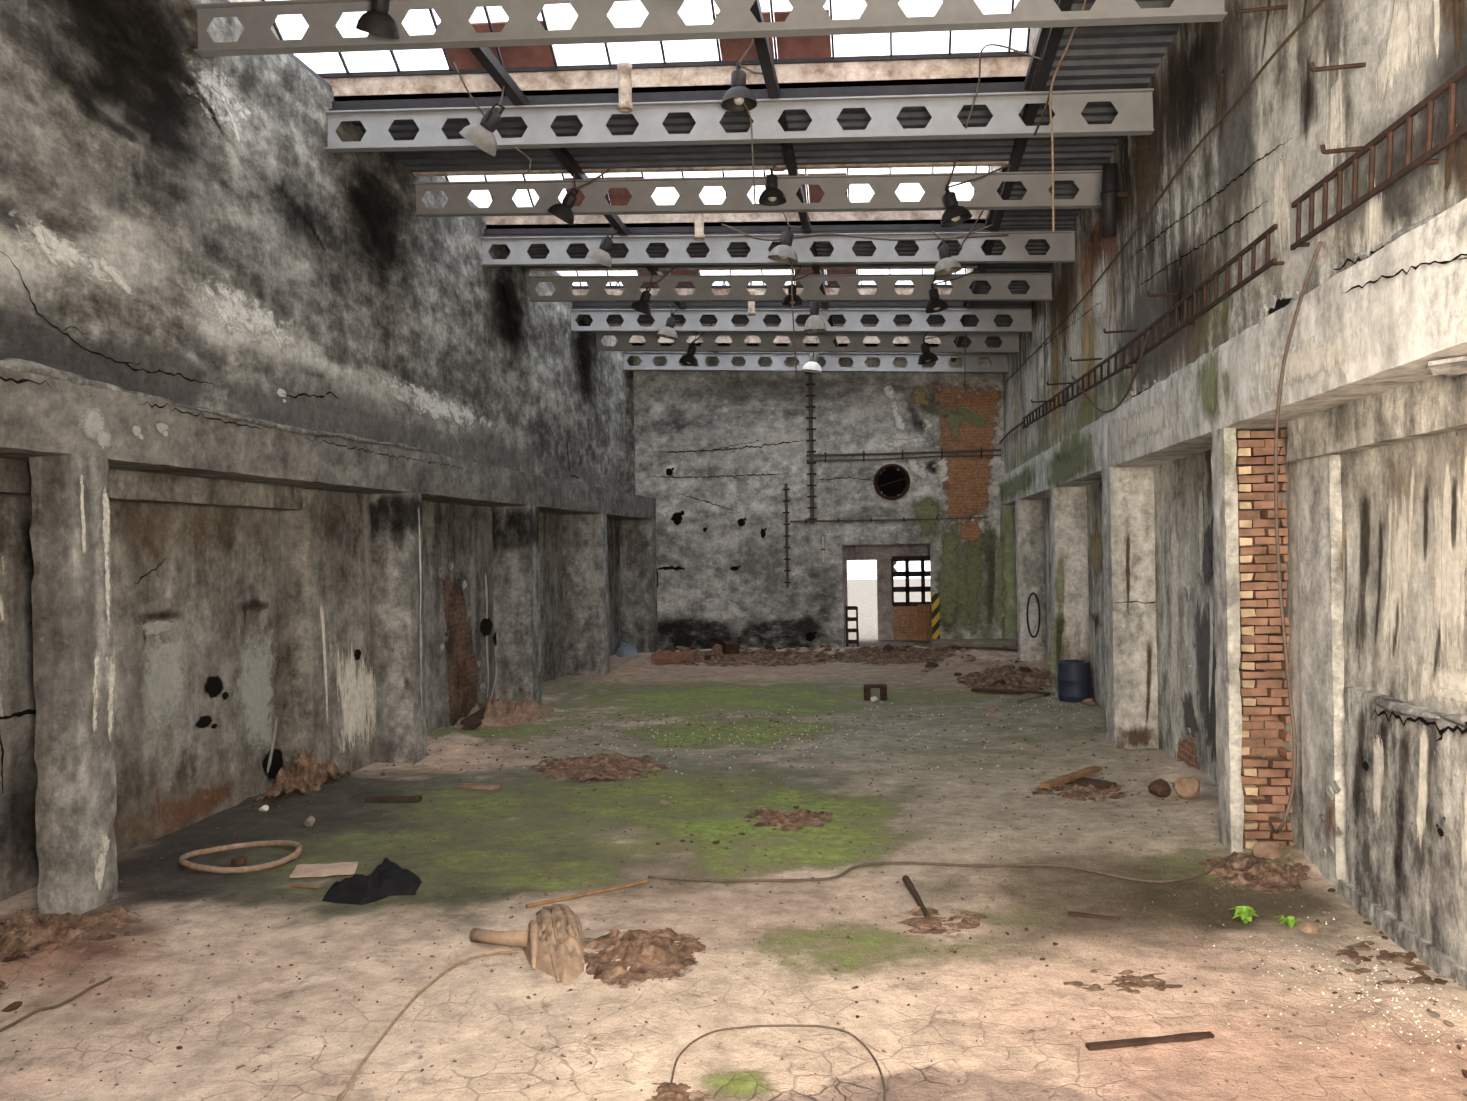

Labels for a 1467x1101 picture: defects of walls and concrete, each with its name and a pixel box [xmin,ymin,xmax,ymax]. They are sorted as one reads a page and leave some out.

damp [77,92,136,141]
damp [156,50,254,143]
crack [1334,246,1467,293]
crack [0,251,259,429]
crack [283,391,339,399]
crack [307,438,463,470]
spalling [927,360,1004,548]
damp [1375,455,1467,710]
crack [0,709,36,794]
damp [1353,707,1428,878]
spalling [1377,701,1467,727]